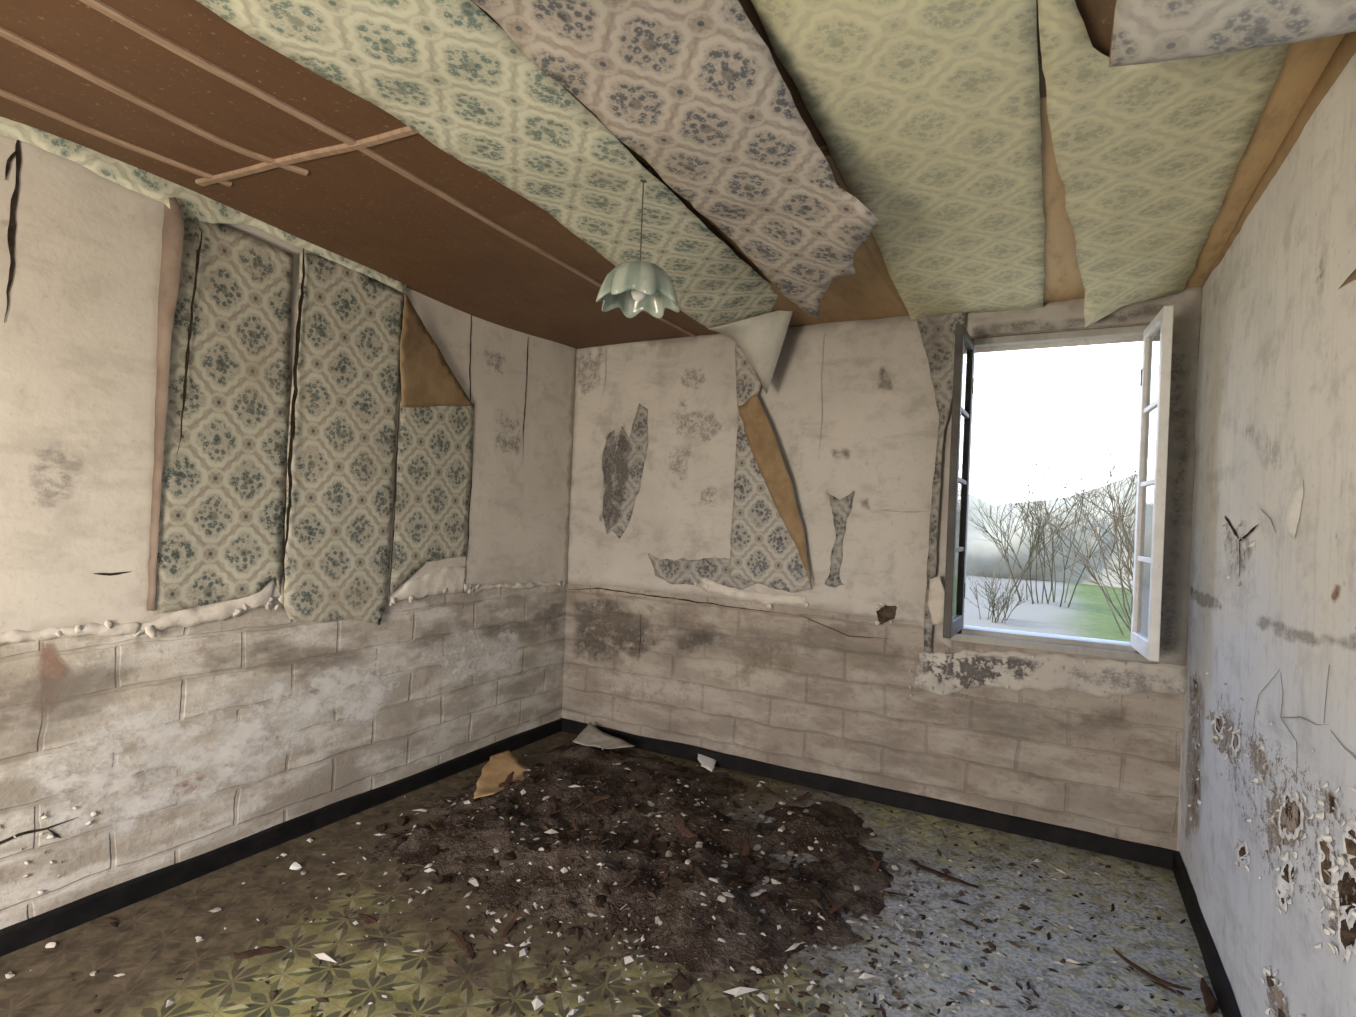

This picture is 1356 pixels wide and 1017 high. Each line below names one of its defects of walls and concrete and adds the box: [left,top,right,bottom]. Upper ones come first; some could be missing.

crack [4,140,21,323]
peeling [400,292,474,408]
flaking render [388,565,566,606]
water stain [434,605,556,683]
water stain [576,600,646,657]
water stain [38,657,399,833]
crack [0,817,79,845]
peeling [1259,965,1305,1017]